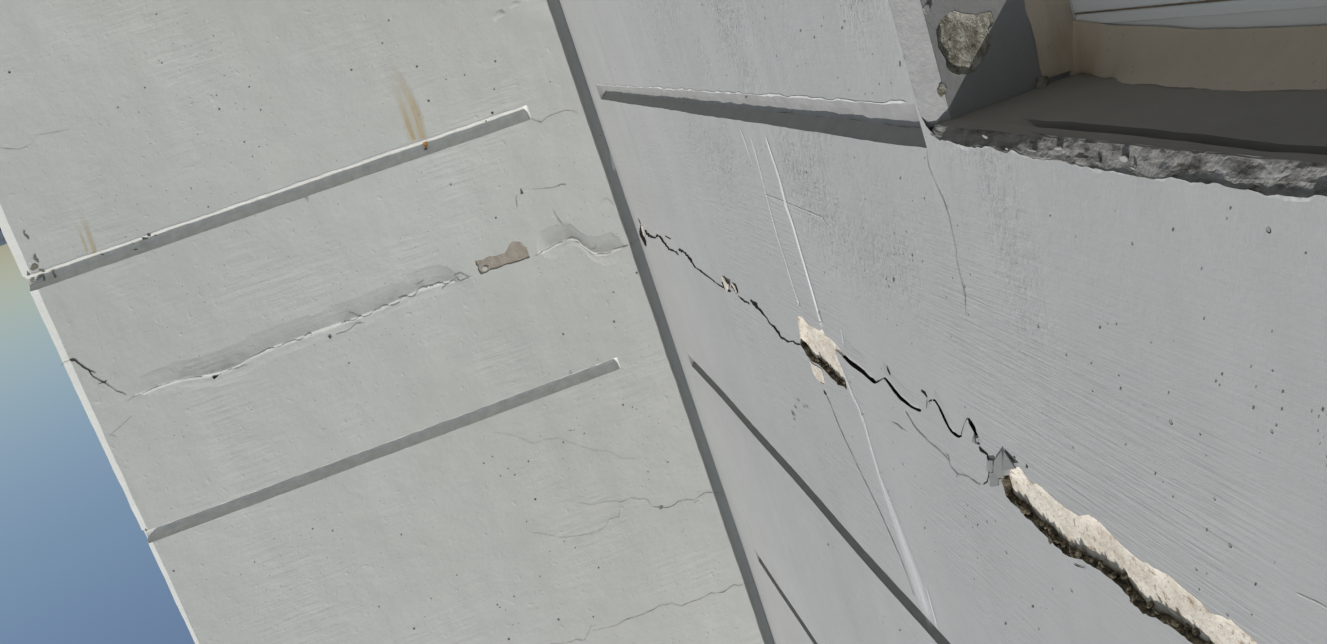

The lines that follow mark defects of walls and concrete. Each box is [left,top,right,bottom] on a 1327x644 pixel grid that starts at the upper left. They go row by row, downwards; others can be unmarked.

spalling [936,11,994,97]
peeling [931,123,1327,202]
spalling [475,241,530,274]
crack [535,199,800,345]
crack [65,272,470,438]
spalling [798,316,847,389]
crack [842,354,989,485]